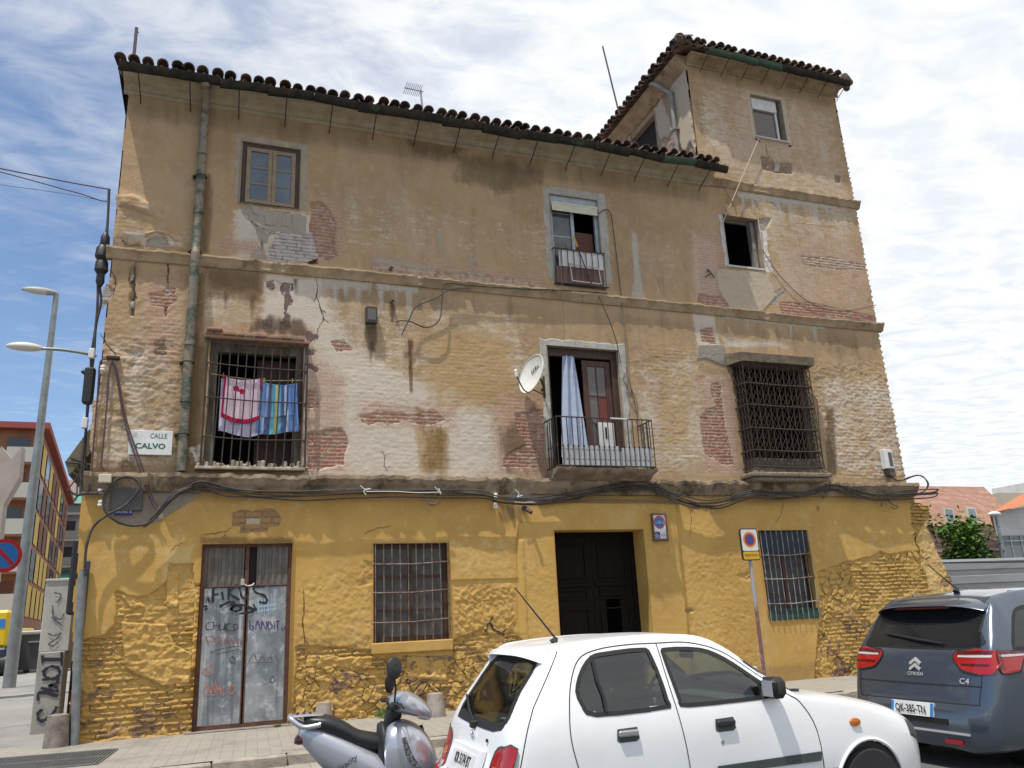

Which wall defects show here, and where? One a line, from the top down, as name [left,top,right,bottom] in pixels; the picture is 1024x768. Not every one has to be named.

spalling [241,202,337,265]
crack [107,267,137,315]
flaking render [306,429,348,470]
flaking render [360,410,446,425]
flaking render [503,410,545,470]
flaking render [700,382,734,465]
spalling [232,508,281,533]
peeling [120,587,200,687]
peeling [307,654,372,668]
peeling [406,656,447,681]